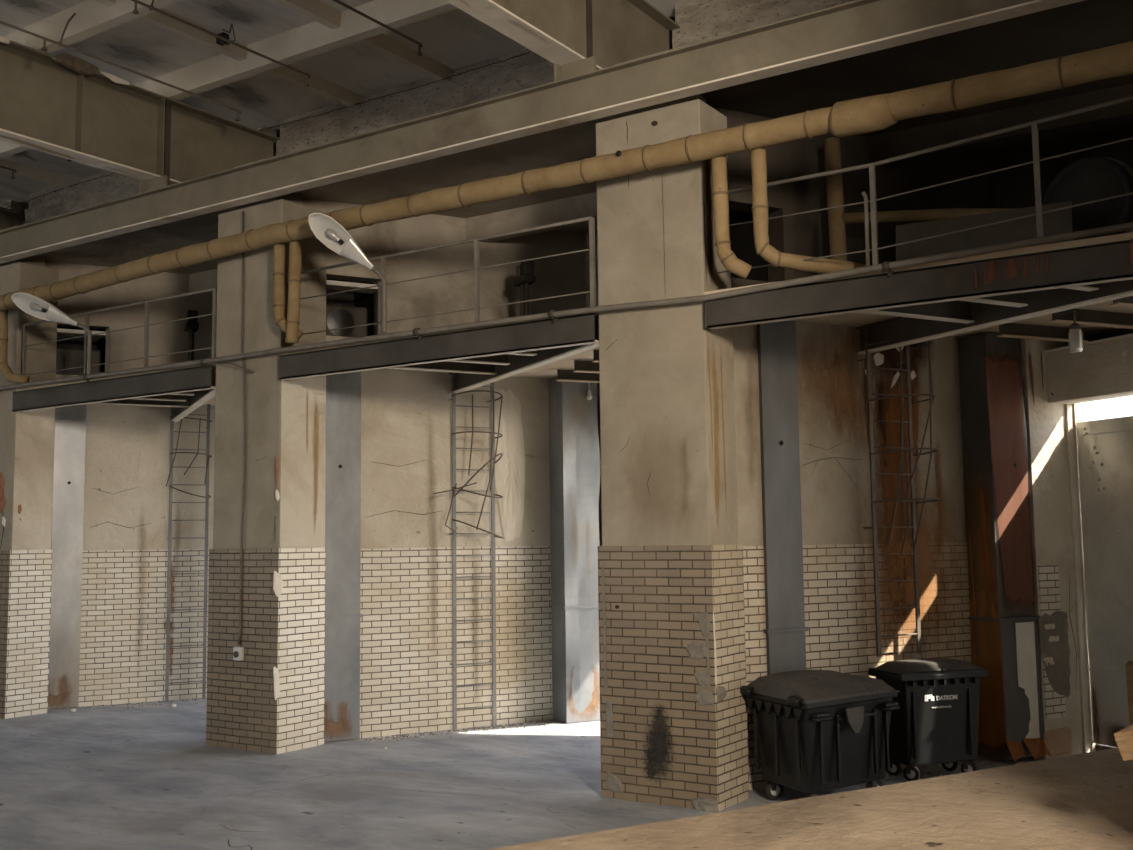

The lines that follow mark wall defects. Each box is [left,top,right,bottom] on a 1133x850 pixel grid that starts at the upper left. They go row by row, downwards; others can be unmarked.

rust [307,402,318,516]
rust [805,342,946,630]
rust [967,352,1043,751]
spalling [713,612,727,702]
spalling [1039,611,1071,698]
damp [647,707,671,777]